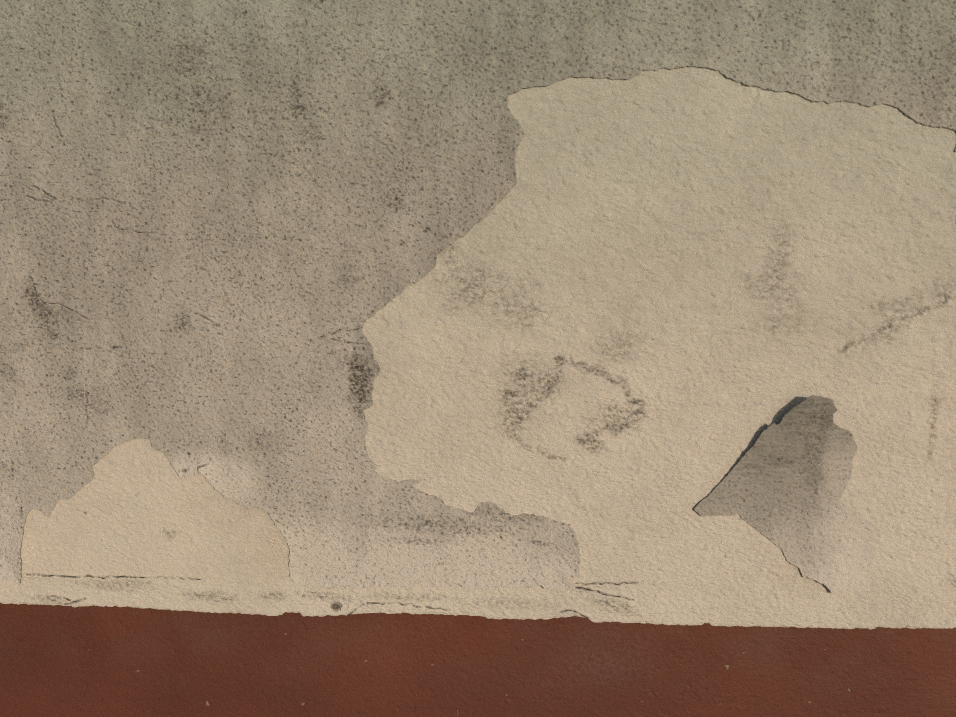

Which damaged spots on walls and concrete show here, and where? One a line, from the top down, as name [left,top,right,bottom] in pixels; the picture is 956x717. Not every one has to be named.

peeling [0,66,956,629]